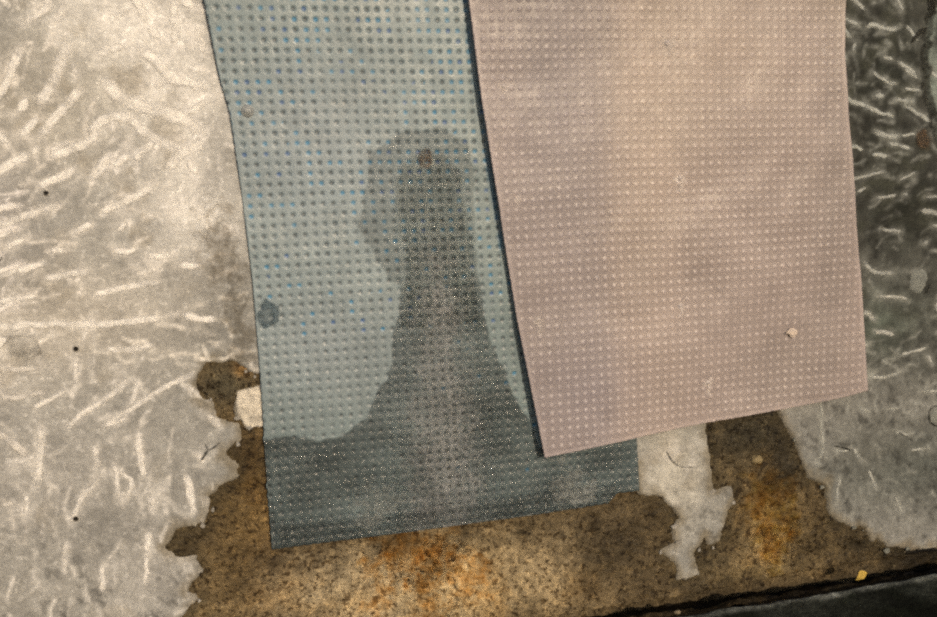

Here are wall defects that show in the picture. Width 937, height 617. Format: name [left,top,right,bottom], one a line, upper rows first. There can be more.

leakage [257,299,279,328]
spalling [165,361,937,617]